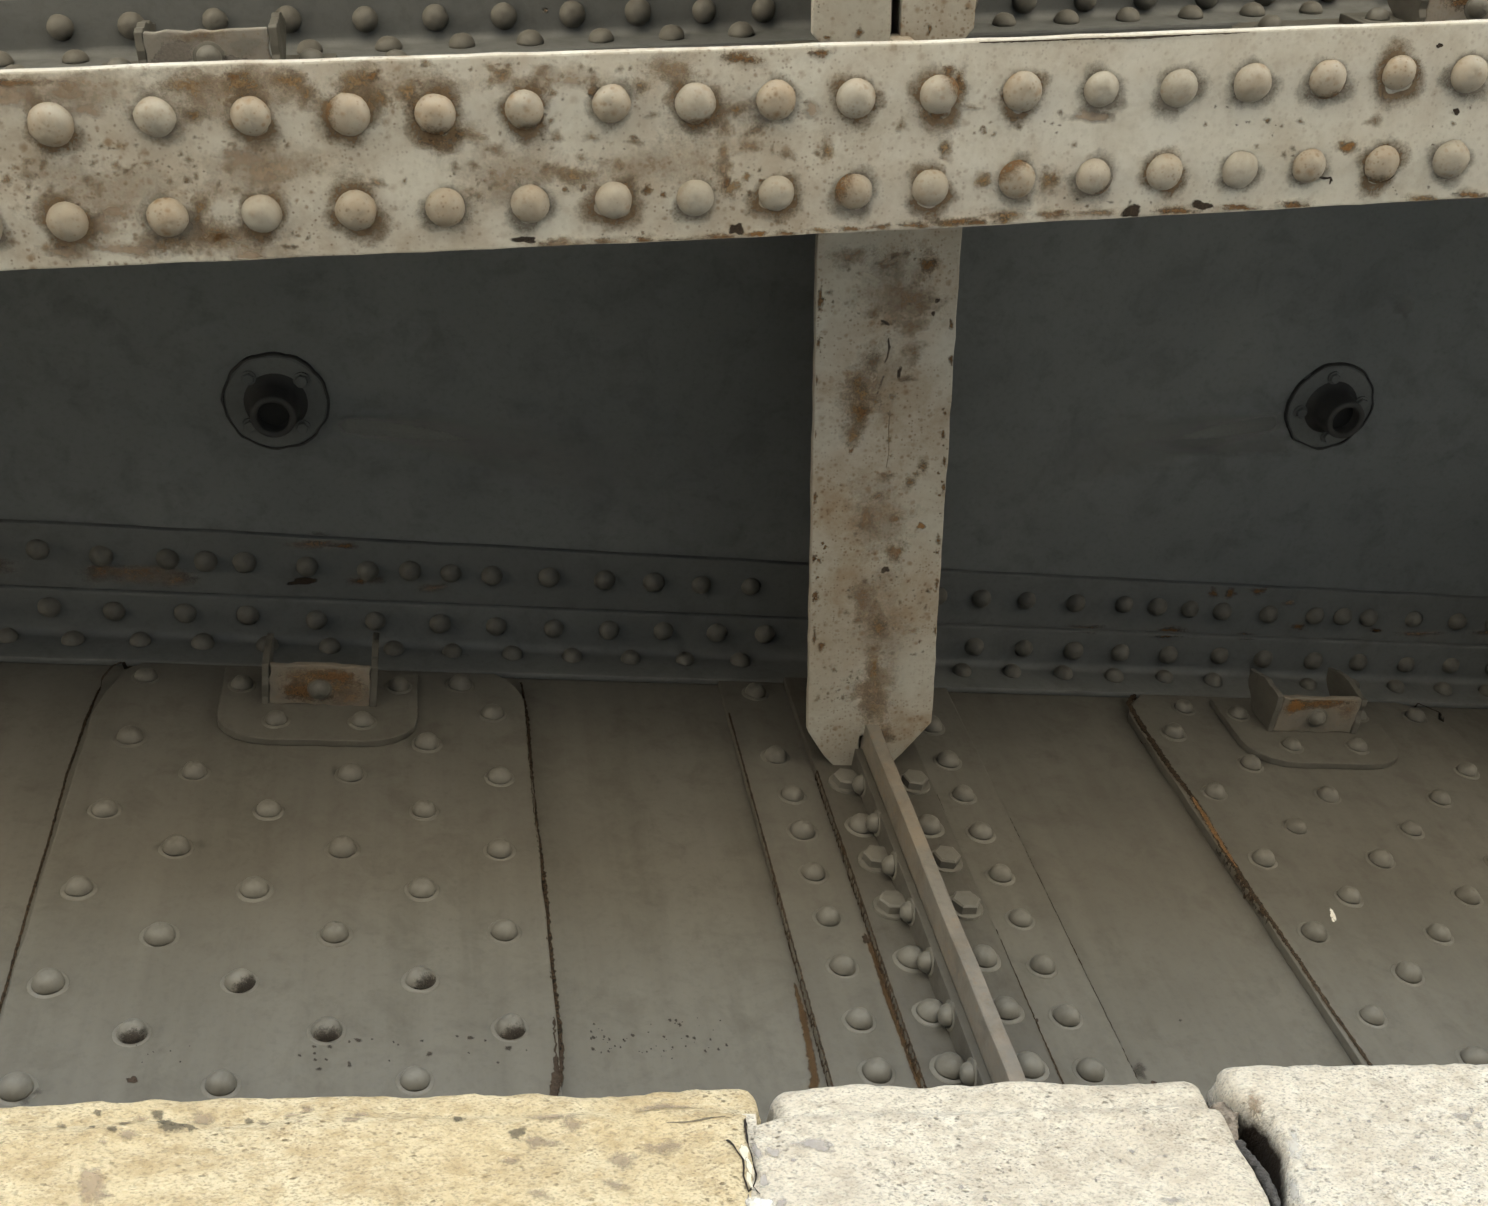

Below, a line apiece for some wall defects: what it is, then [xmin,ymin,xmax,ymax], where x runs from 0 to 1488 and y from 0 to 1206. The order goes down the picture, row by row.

corrosion [0,33,691,259]
corrosion [651,60,832,239]
corrosion [727,53,761,63]
corrosion [814,66,1018,233]
corrosion [974,73,1109,136]
corrosion [1040,150,1253,219]
corrosion [1339,142,1437,201]
corrosion [1368,40,1423,125]
corrosion [840,250,948,535]
corrosion [813,545,936,739]
corrosion [728,713,834,1089]
corrosion [1126,694,1373,1066]